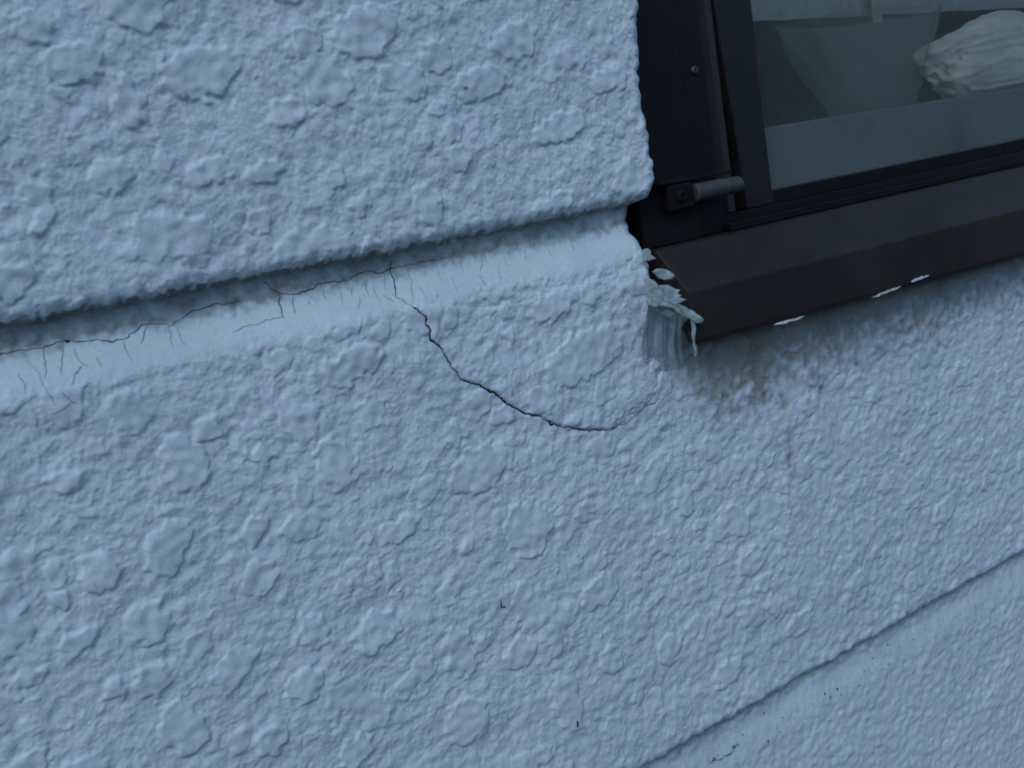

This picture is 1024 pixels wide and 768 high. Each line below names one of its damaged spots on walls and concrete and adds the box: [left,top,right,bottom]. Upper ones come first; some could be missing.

crack [0,301,236,414]
crack [236,243,673,432]
peeling [642,248,704,372]